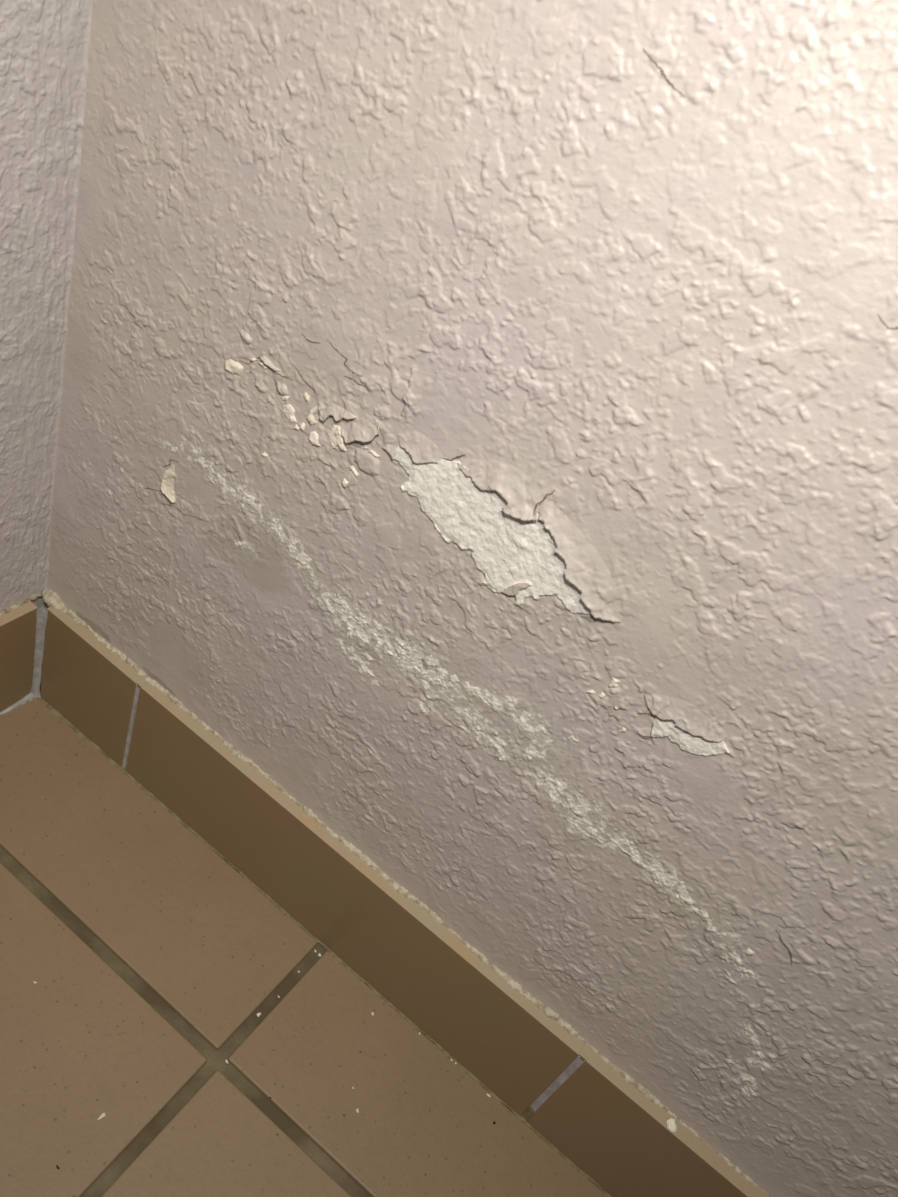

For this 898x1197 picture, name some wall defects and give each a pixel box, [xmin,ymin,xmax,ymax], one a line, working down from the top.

spalling [0,588,771,1197]
peeling [224,329,623,623]
water stain [158,435,760,1004]